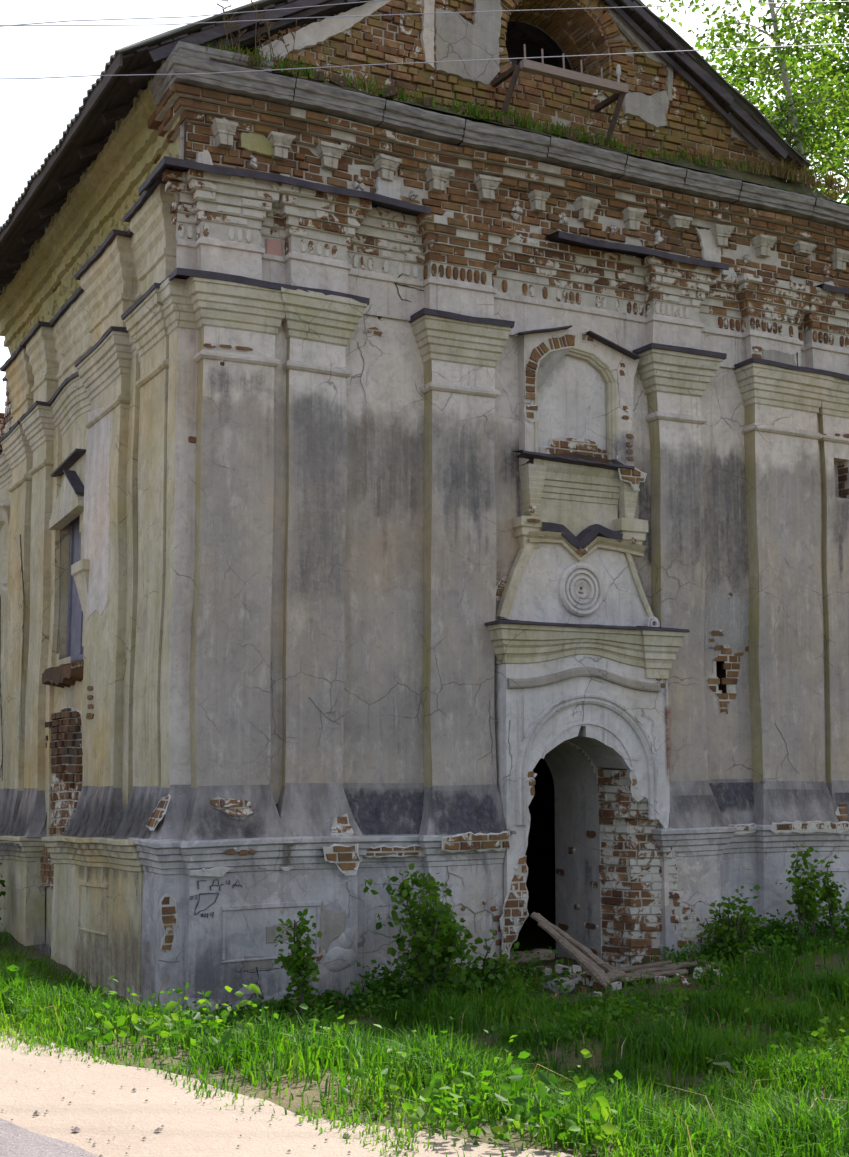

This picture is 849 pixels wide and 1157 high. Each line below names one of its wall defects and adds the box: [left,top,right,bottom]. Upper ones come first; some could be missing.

peeling [256,0,391,64]
peeling [420,0,502,85]
peeling [607,6,673,129]
peeling [375,177,402,213]
flaking render [524,331,596,423]
spalling [705,629,749,714]
flaking render [40,685,94,888]
flaking render [208,793,254,821]
flaking render [323,812,425,875]
leakage [346,789,511,835]
flaking render [159,891,179,952]
flaking render [442,831,529,954]